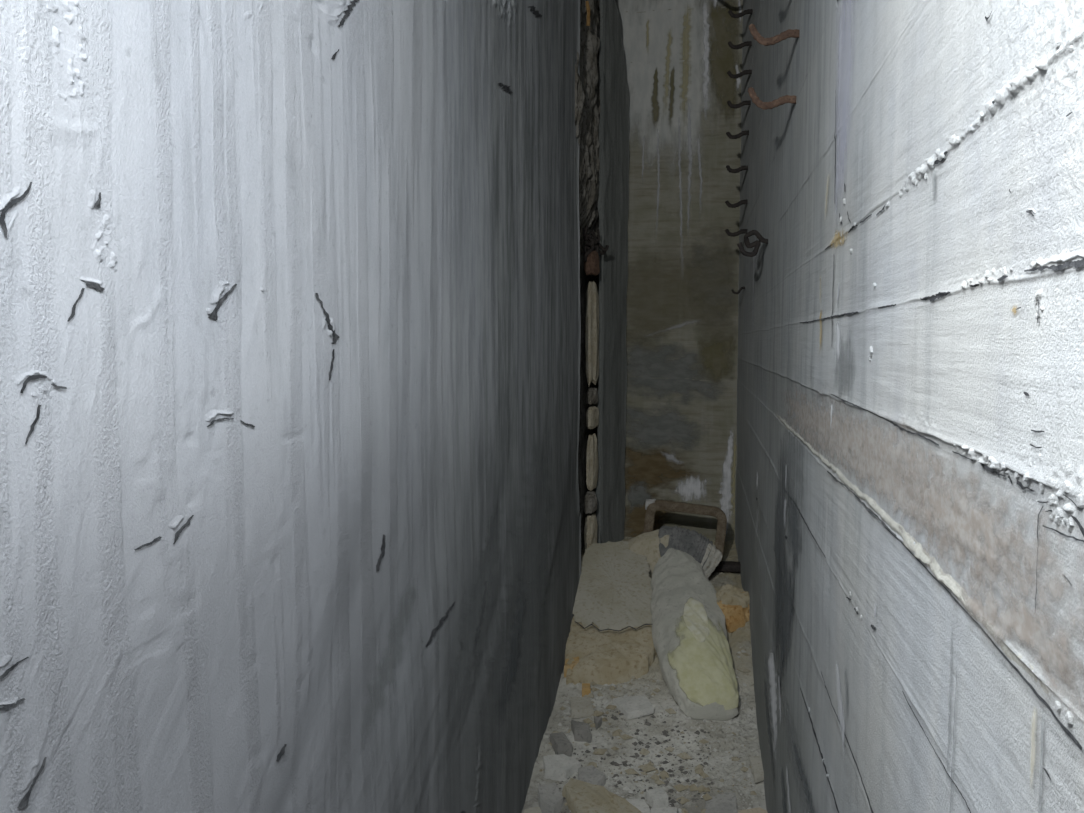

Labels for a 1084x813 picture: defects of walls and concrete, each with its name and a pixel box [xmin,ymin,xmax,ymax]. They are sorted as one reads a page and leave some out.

water stain [652,14,690,123]
water stain [708,0,742,117]
crack [831,90,839,164]
crack [800,251,1084,323]
water stain [786,391,1073,688]
water stain [765,466,814,813]